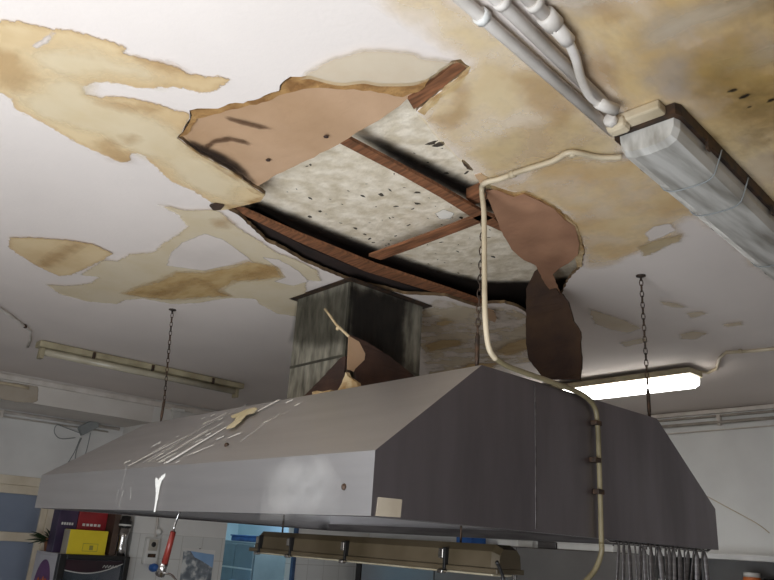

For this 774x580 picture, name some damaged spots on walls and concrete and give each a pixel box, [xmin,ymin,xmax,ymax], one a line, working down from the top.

leakage [0,20,321,316]
spalling [249,202,529,322]
spalling [364,138,489,198]
leakage [430,27,691,260]
leakage [559,0,774,171]
leakage [756,177,774,201]